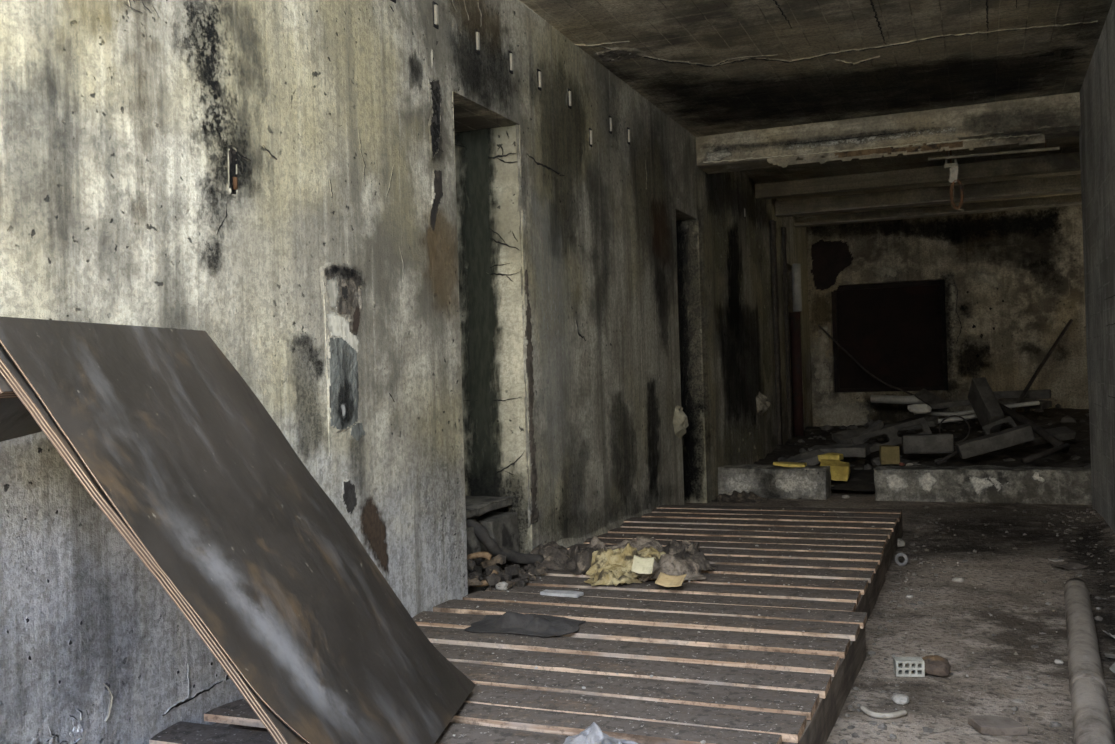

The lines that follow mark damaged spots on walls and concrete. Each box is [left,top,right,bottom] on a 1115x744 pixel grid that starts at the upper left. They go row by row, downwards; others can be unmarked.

crack [575,0,1098,67]
spalling [319,262,365,442]
rust [361,497,389,572]